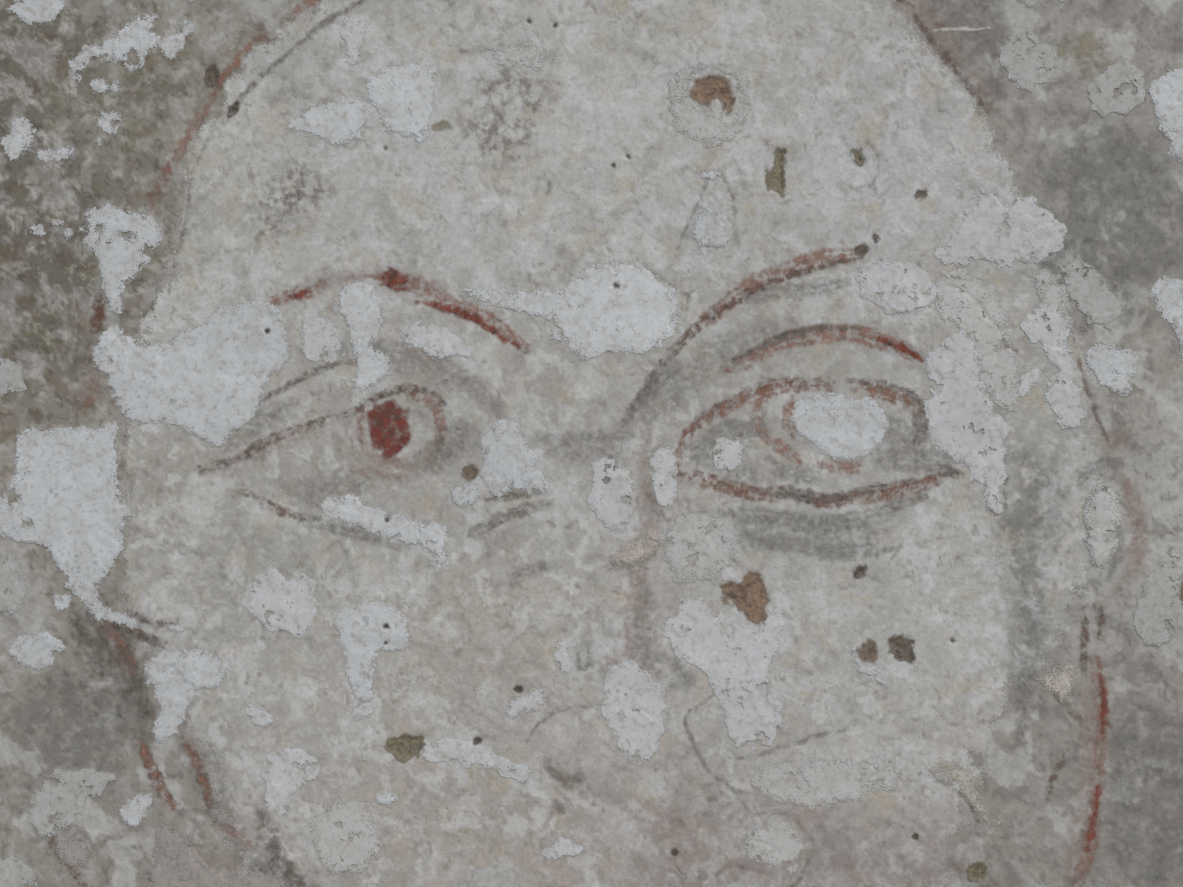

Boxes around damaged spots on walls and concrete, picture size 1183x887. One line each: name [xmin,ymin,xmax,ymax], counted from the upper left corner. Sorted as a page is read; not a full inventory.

peeling [68,12,195,94]
peeling [287,61,452,150]
peeling [667,61,752,148]
peeling [1087,58,1183,163]
peeling [462,258,682,363]
peeling [855,188,1141,515]
peeling [0,202,394,638]
peeling [450,416,550,509]
peeling [321,492,449,574]
peeling [648,443,785,748]
peeling [139,647,232,744]
peeling [601,659,668,765]